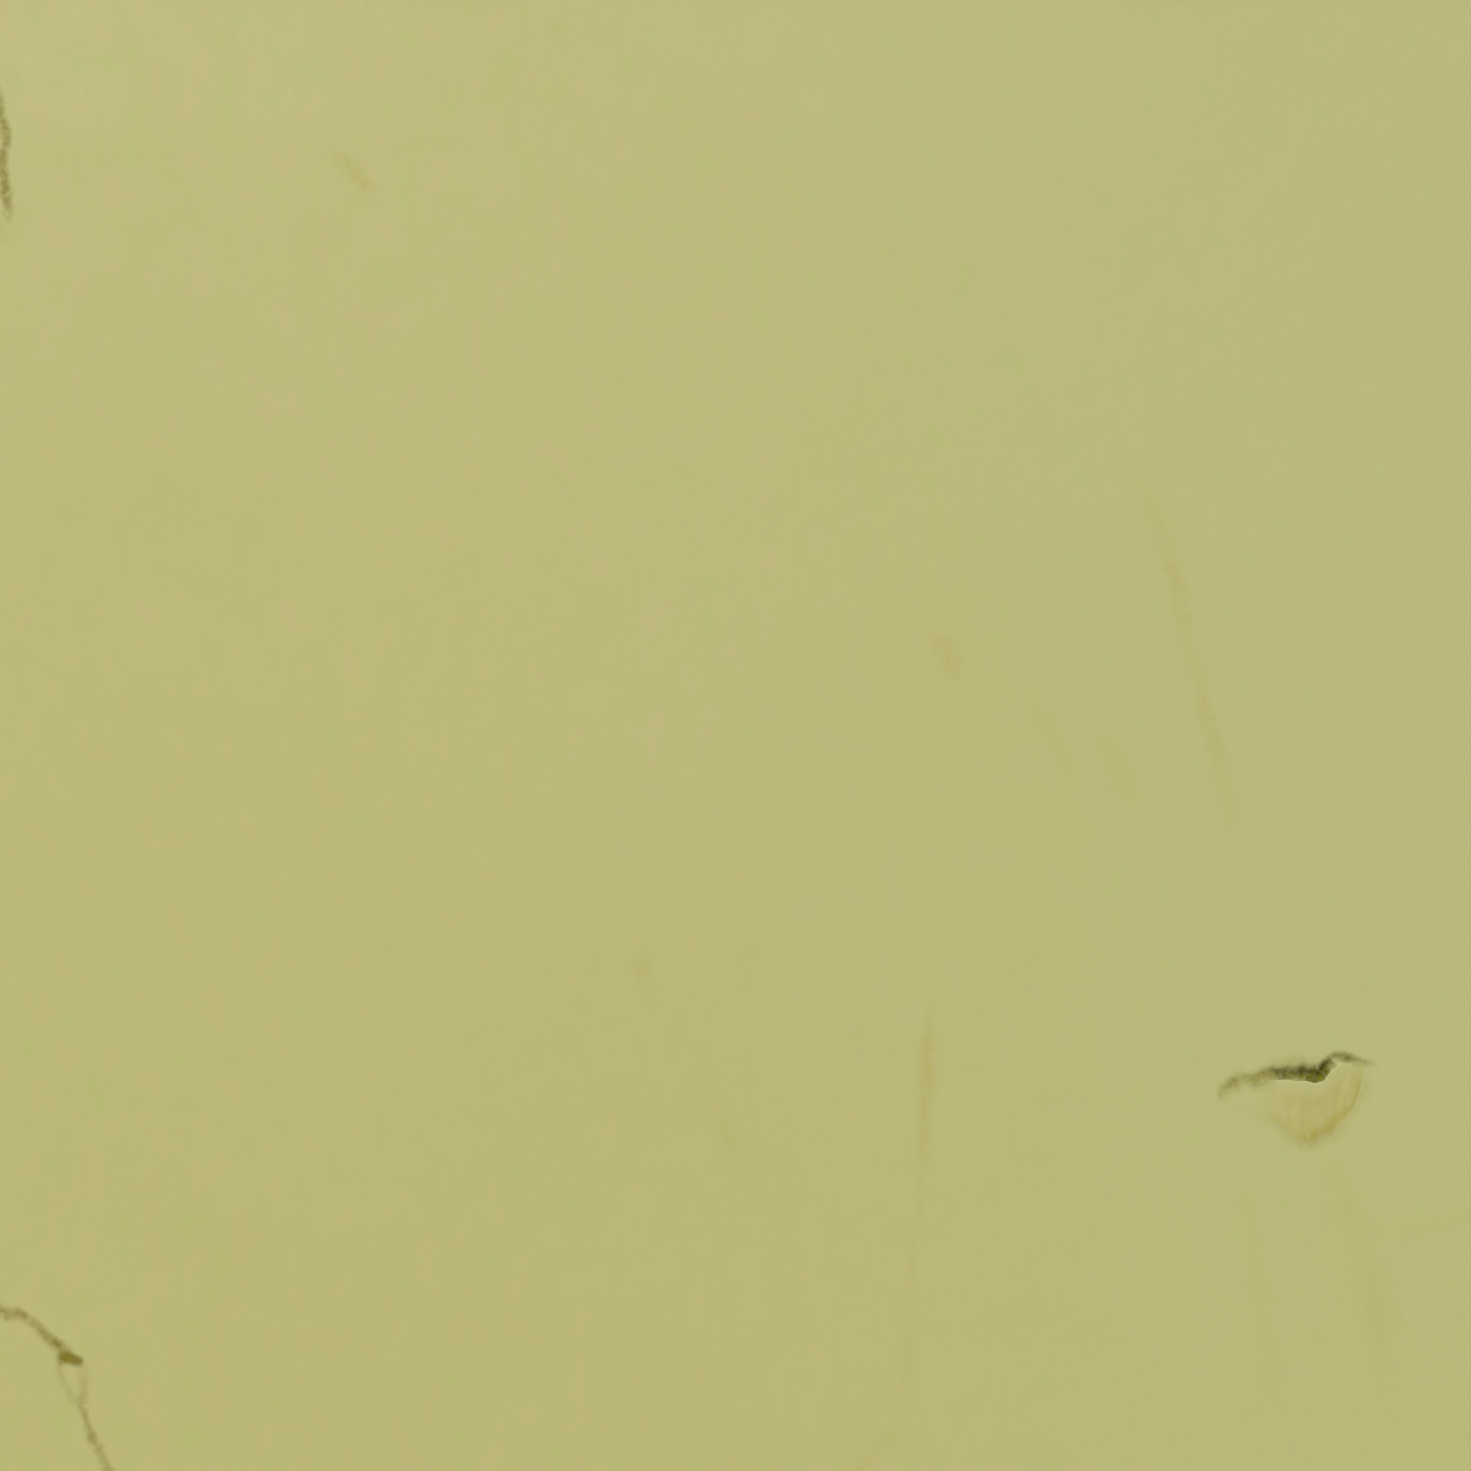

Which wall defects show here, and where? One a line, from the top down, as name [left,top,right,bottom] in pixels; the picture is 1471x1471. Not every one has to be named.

peeling [1252,1057,1366,1145]
crack [54,1341,76,1362]